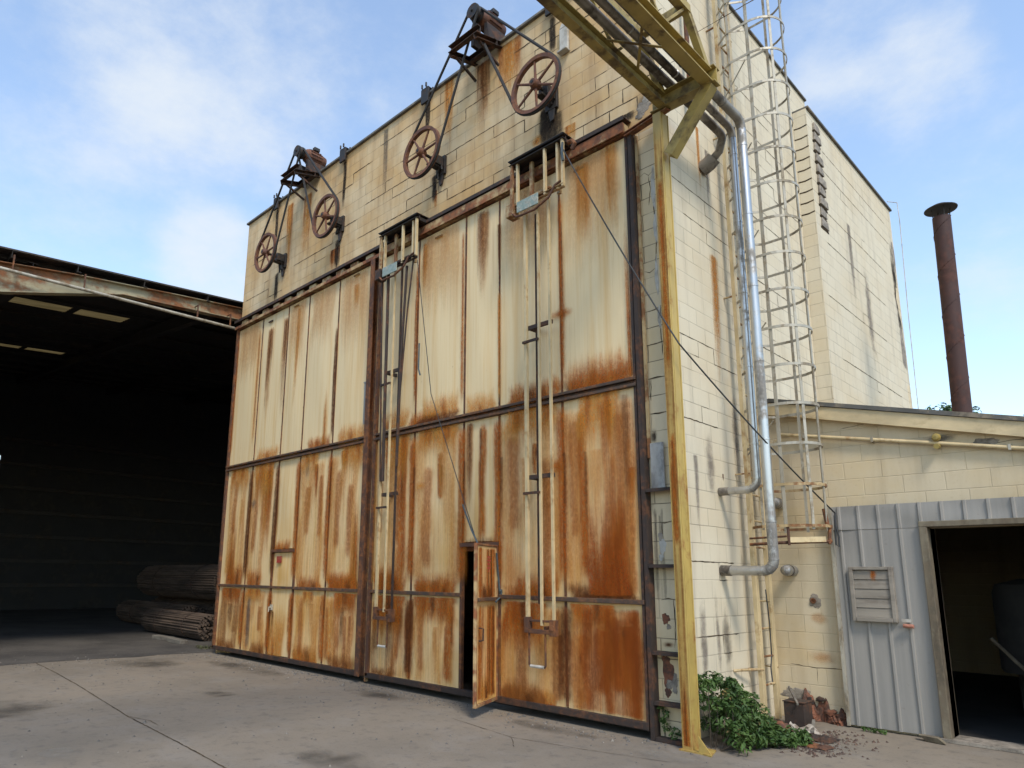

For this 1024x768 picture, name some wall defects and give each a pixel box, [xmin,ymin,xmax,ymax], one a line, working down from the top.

corrosion [478,62,487,100]
corrosion [216,329,364,670]
corrosion [370,200,643,720]
spalling [662,656,678,698]